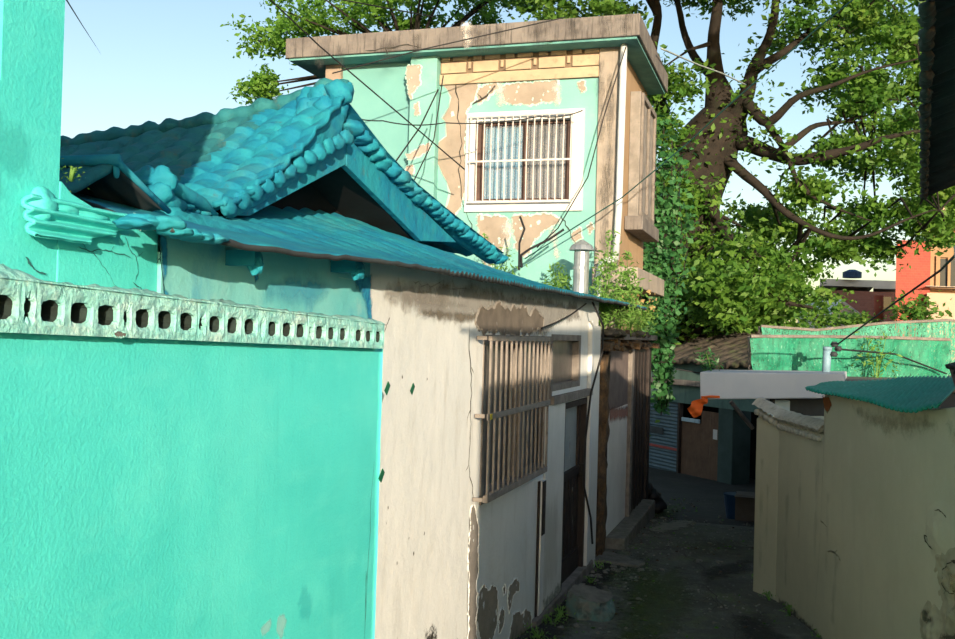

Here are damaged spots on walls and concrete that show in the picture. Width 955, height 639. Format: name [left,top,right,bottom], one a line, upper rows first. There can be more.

peeling [405,64,422,116]
peeling [577,79,587,94]
peeling [404,79,560,215]
peeling [475,211,562,258]
peeling [570,222,595,243]
crack [80,237,165,294]
leakage [388,284,579,335]
spalling [475,300,544,336]
crack [466,328,474,494]
peeling [467,504,532,639]